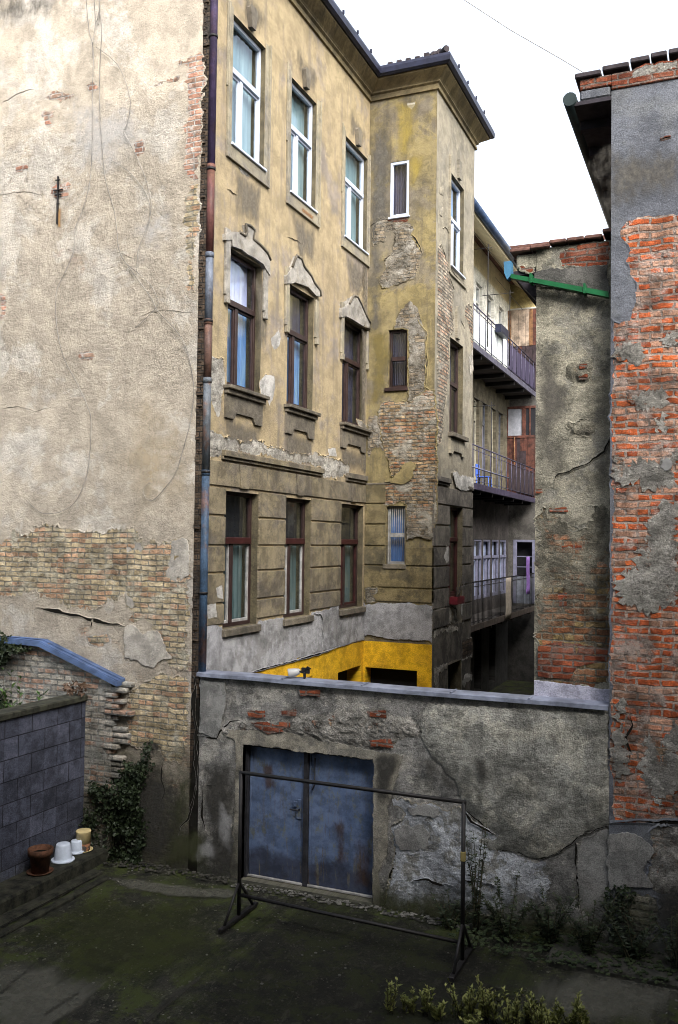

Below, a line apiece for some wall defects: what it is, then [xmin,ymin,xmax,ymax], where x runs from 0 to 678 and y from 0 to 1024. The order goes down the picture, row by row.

flaking render [371,216,422,289]
flaking render [210,355,350,480]
flaking render [356,244,474,541]
crack [546,434,610,532]
crack [36,606,125,628]
flaking render [533,213,678,938]
crack [173,675,240,835]
flaking render [0,522,553,917]
crack [388,852,497,887]
crack [466,810,678,915]